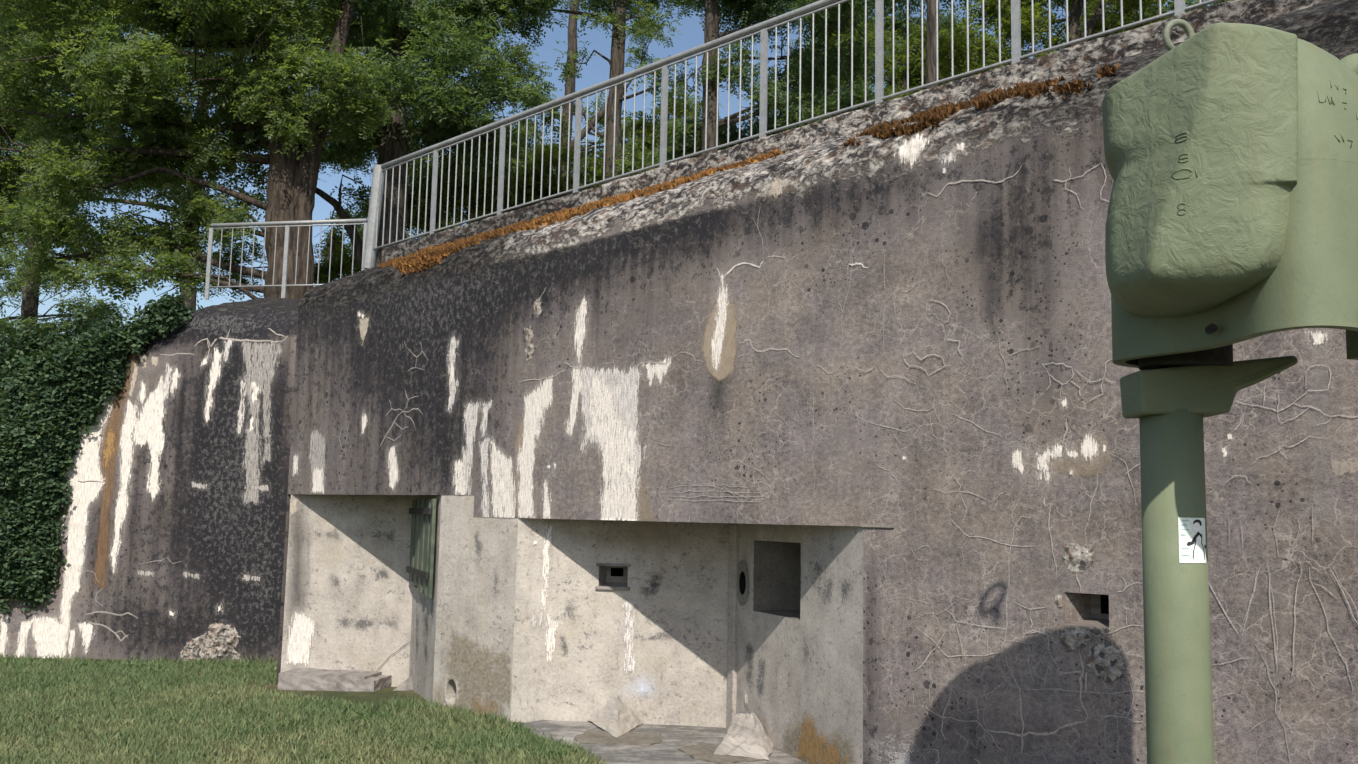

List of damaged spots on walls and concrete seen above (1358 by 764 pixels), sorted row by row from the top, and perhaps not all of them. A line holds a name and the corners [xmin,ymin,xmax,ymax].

crack [716,210,787,295]
crack [380,341,428,446]
crack [738,163,1143,764]
spalling [1063,543,1094,572]
crack [1208,364,1358,689]
spalling [180,623,241,662]
spalling [1059,626,1126,682]
rust [780,711,855,764]
crack [1255,644,1291,764]